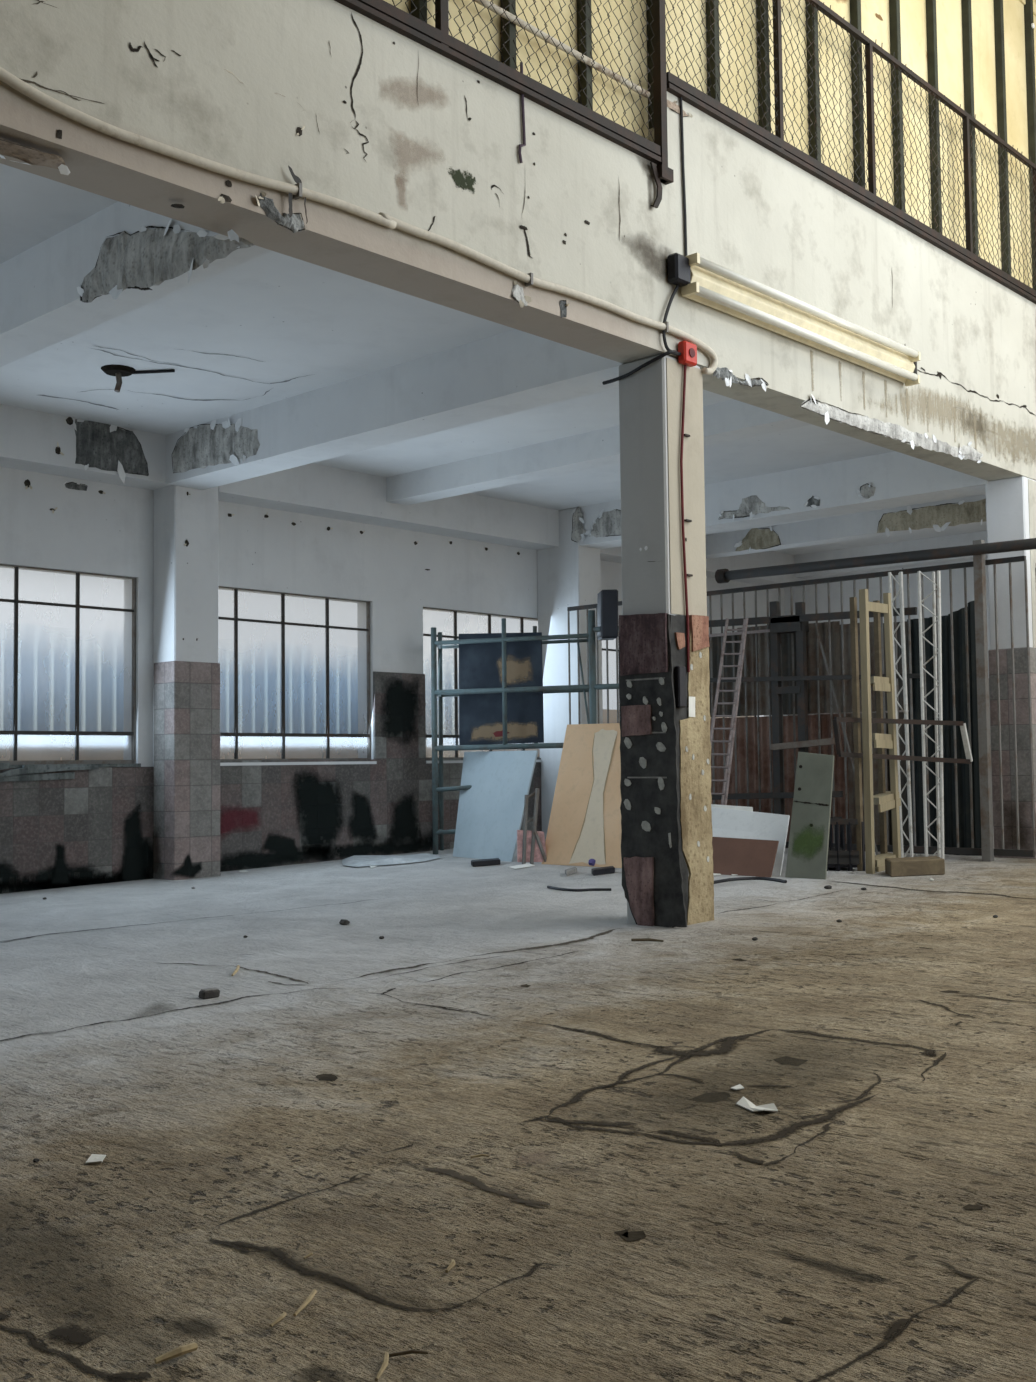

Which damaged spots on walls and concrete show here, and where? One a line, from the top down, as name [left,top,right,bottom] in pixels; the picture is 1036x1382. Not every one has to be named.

crack [275,12,369,161]
peeling [218,180,232,204]
spalling [256,165,308,233]
spalling [77,204,254,302]
spalling [55,417,149,494]
spalling [172,418,260,473]
crack [0,928,1036,1166]
crack [210,1144,559,1310]
crack [0,1311,152,1382]